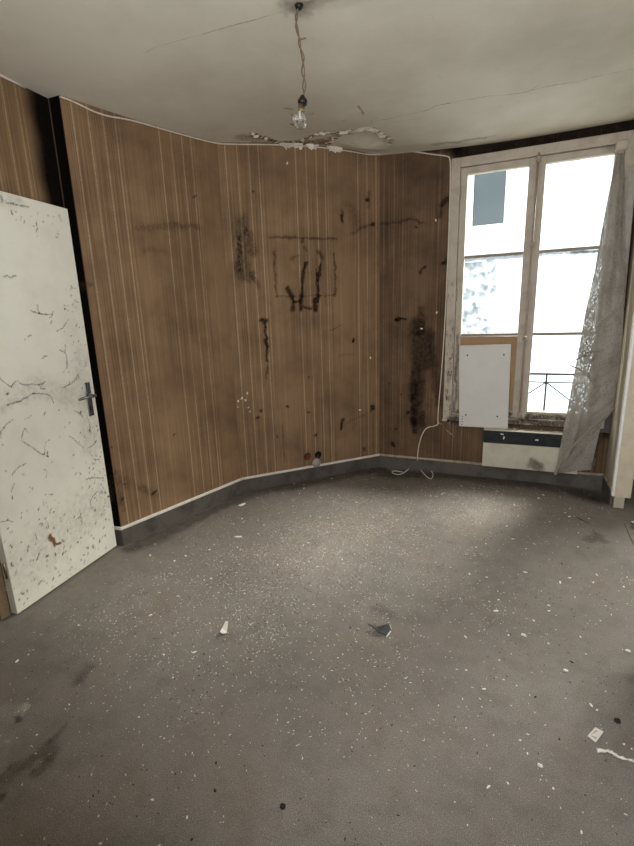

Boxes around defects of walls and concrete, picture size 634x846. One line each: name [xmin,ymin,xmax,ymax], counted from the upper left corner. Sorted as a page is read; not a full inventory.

peeling [250,127,392,153]
leakage [395,317,429,433]